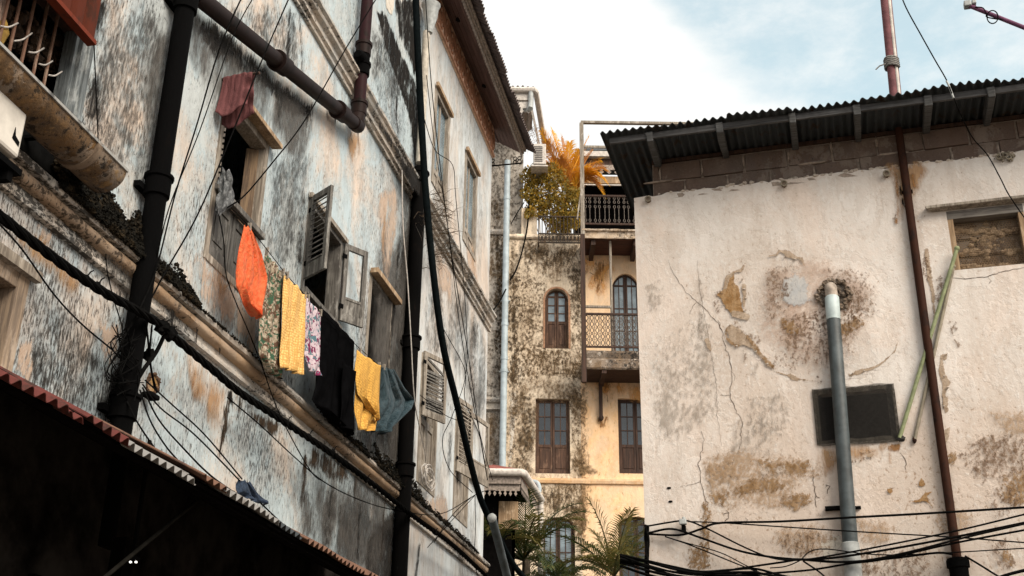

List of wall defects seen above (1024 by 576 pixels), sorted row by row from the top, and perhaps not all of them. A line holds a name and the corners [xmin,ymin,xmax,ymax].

damp [371,0,421,382]
damp [367,421,400,467]
damp [425,200,609,551]
damp [602,383,641,402]
crack [669,263,748,521]
spalling [714,263,822,384]
damp [766,265,829,370]
damp [824,268,879,354]